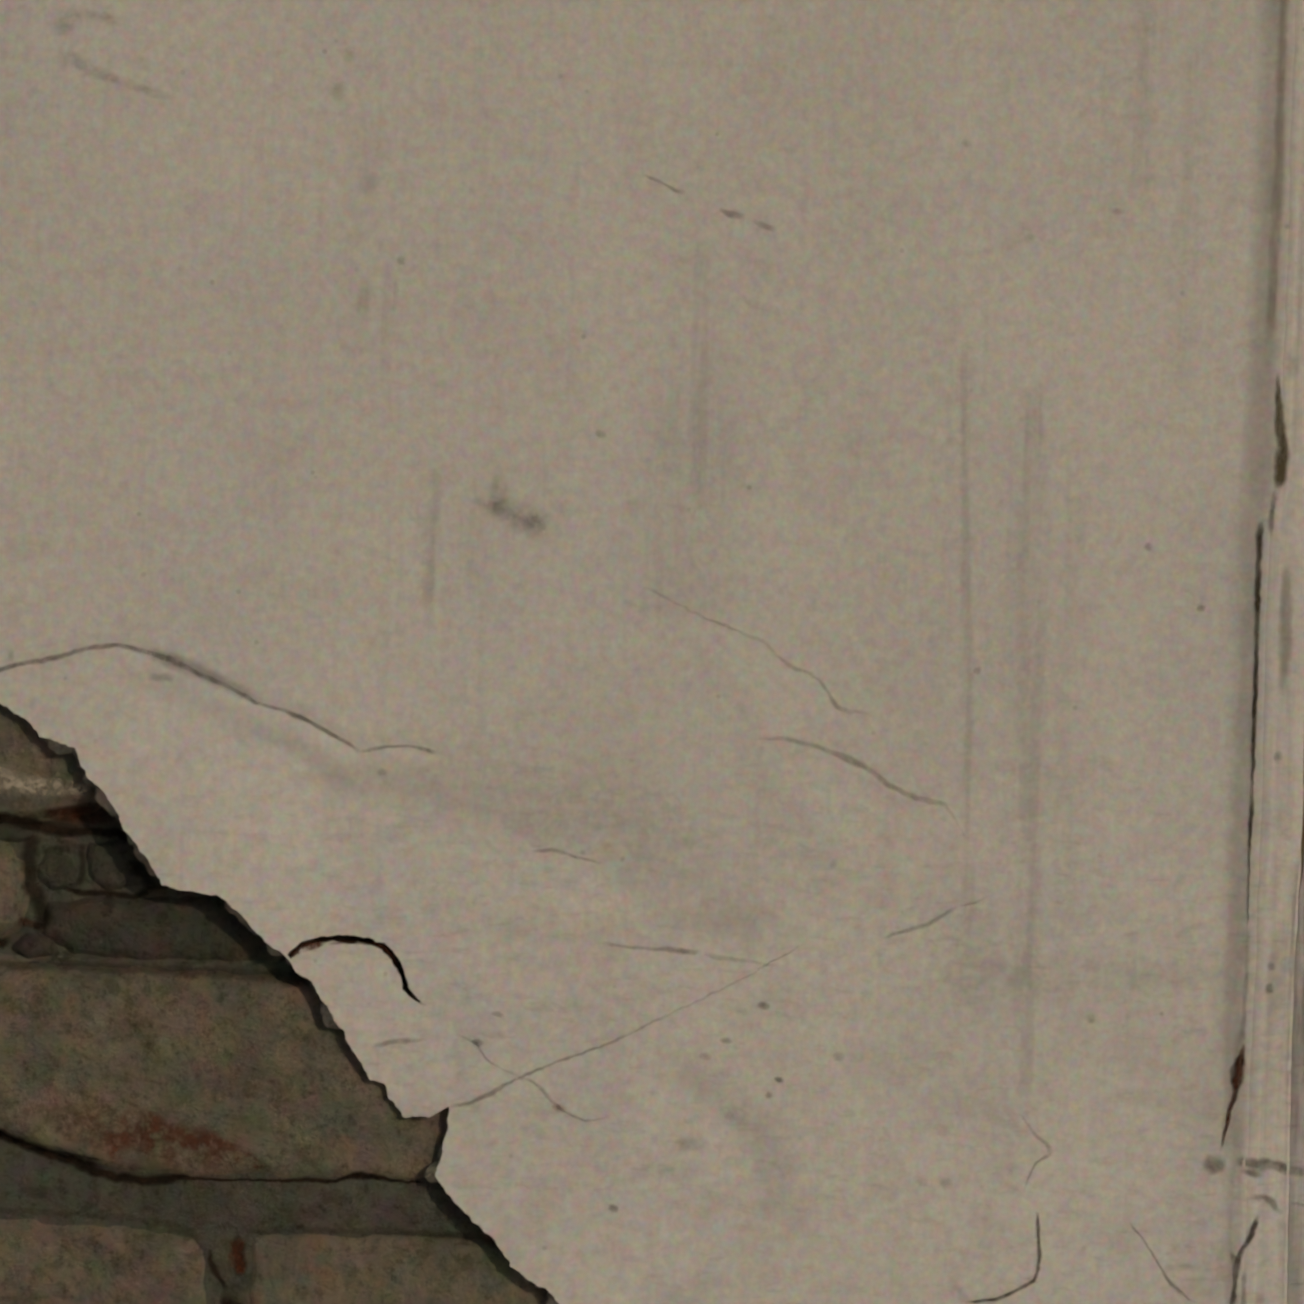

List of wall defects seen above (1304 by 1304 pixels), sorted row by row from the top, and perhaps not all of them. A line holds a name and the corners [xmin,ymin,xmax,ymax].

flaking render [0,704,559,1304]
crack [283,935,420,1002]